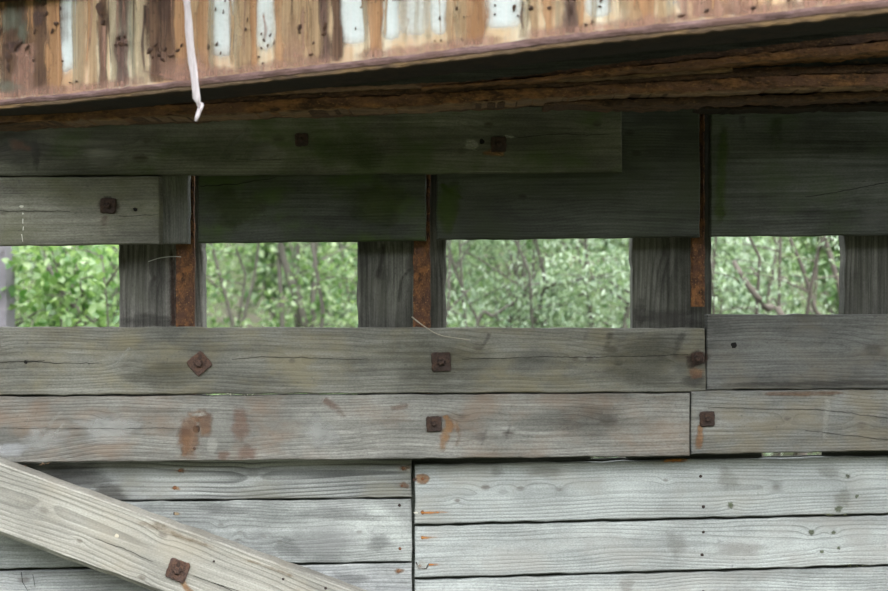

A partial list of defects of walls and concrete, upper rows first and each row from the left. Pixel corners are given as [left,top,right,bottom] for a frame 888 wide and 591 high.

corrosion [179,411,211,454]